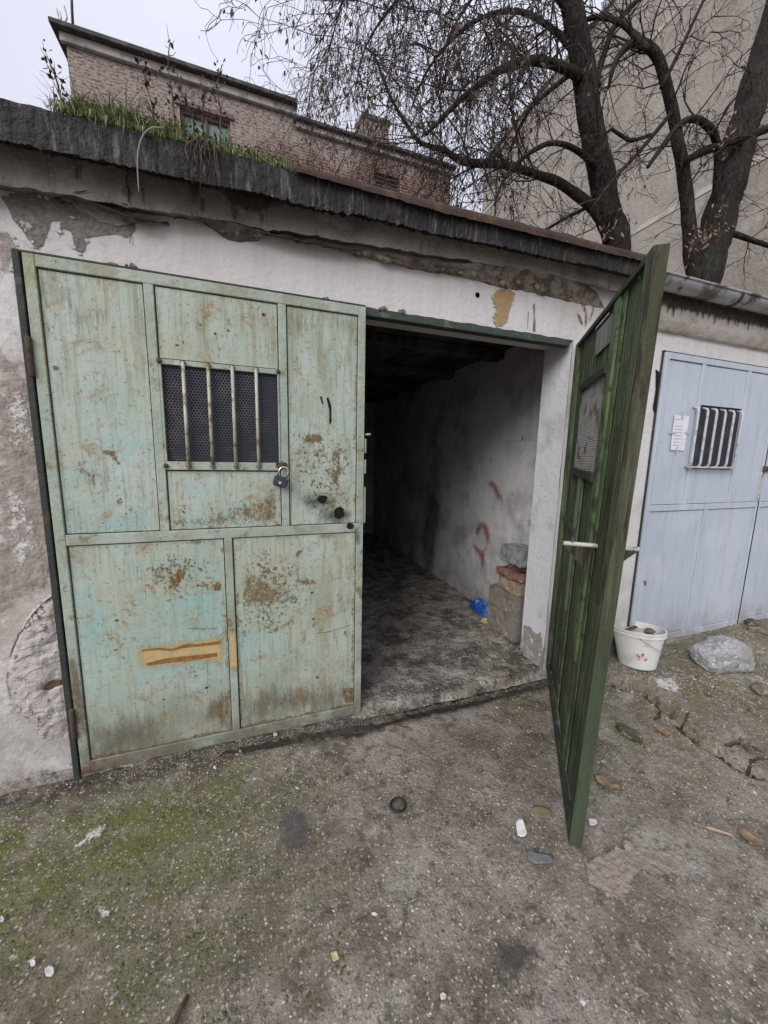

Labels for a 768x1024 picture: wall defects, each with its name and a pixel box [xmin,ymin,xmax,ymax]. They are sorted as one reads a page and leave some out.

flaking render [0,191,604,327]
rust [293,427,356,508]
rust [174,490,280,543]
rust [138,550,316,667]
peeling [523,624,543,657]
rust [96,683,316,759]
rust [329,688,354,710]